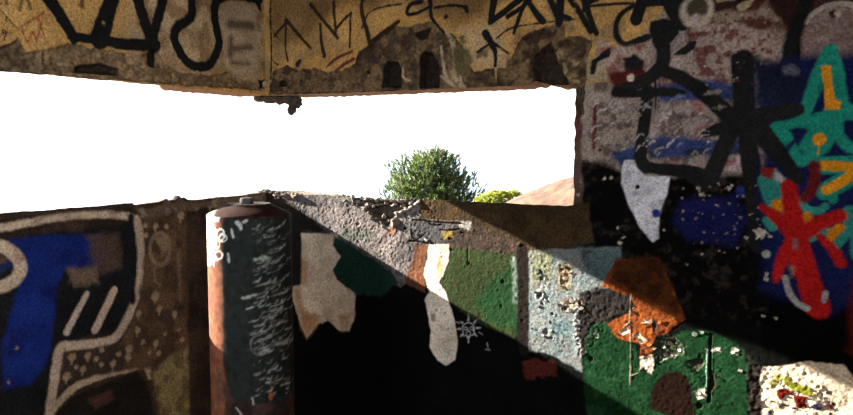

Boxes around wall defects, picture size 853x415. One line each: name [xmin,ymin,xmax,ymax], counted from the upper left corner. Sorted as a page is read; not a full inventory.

spalling [233,189,303,202]
spalling [342,194,421,235]
peeling [531,262,587,357]
peeling [601,255,740,400]